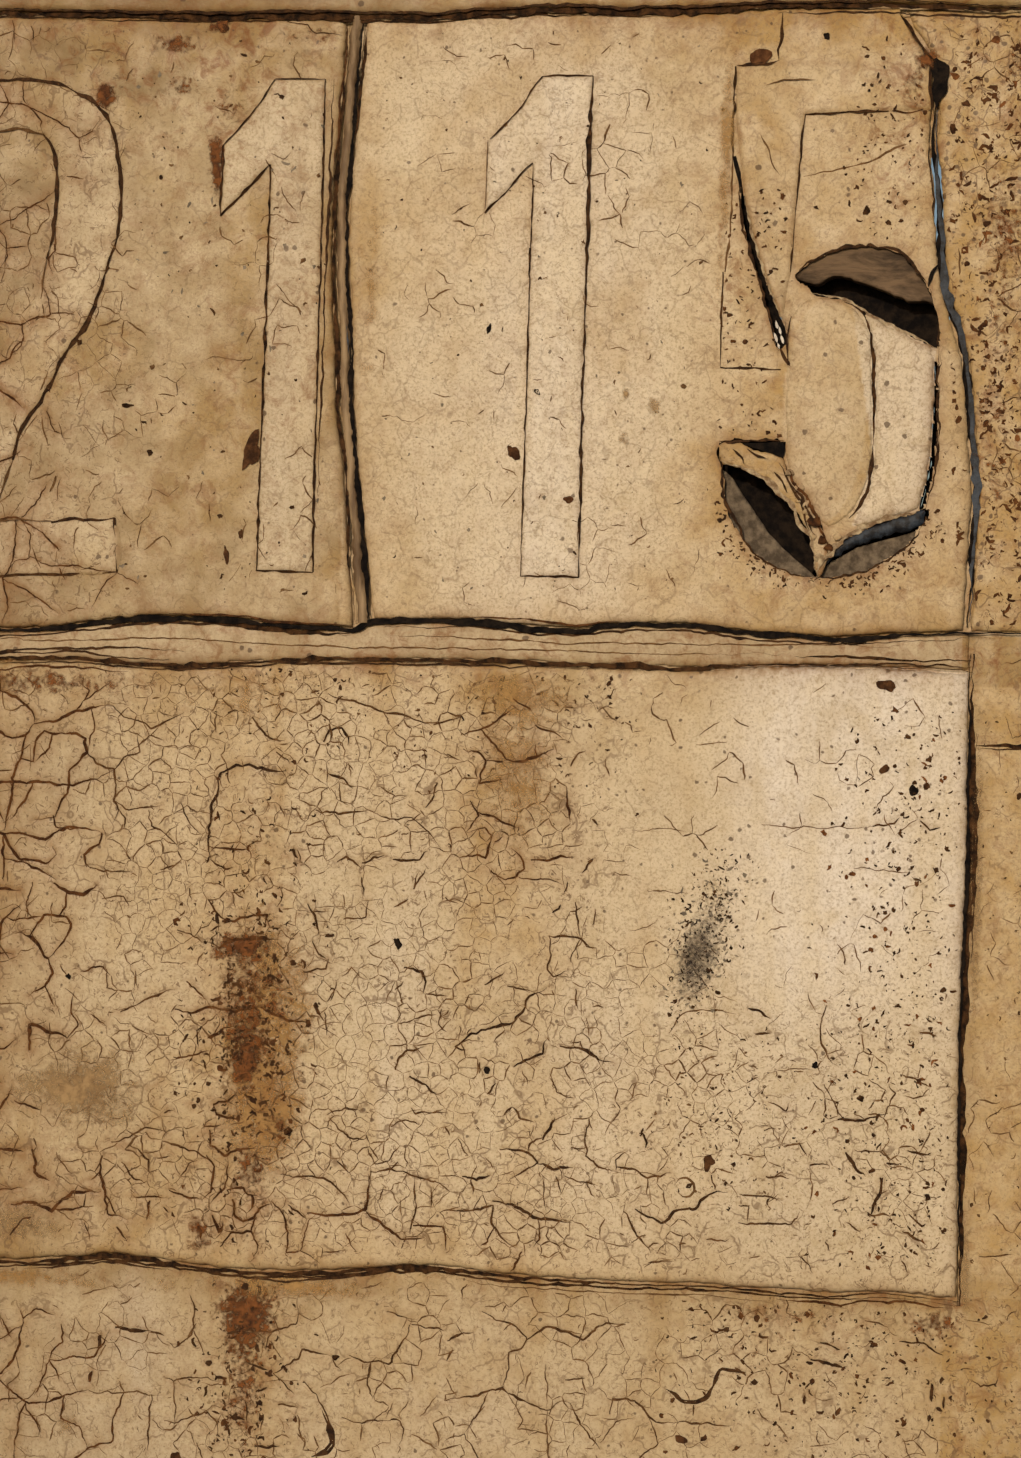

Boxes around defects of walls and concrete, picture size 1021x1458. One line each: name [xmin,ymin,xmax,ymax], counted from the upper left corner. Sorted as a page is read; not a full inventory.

peeling [750,48,772,64]
crack [490,89,708,295]
crack [0,174,146,412]
crack [0,411,136,620]
peeling [785,469,836,568]
crack [762,741,938,853]
corrosion [211,932,293,1096]
corrosion [189,1209,212,1249]
corrosion [237,1142,268,1188]
crack [732,1186,799,1225]
crack [775,988,945,1279]
corrosion [216,1279,283,1451]